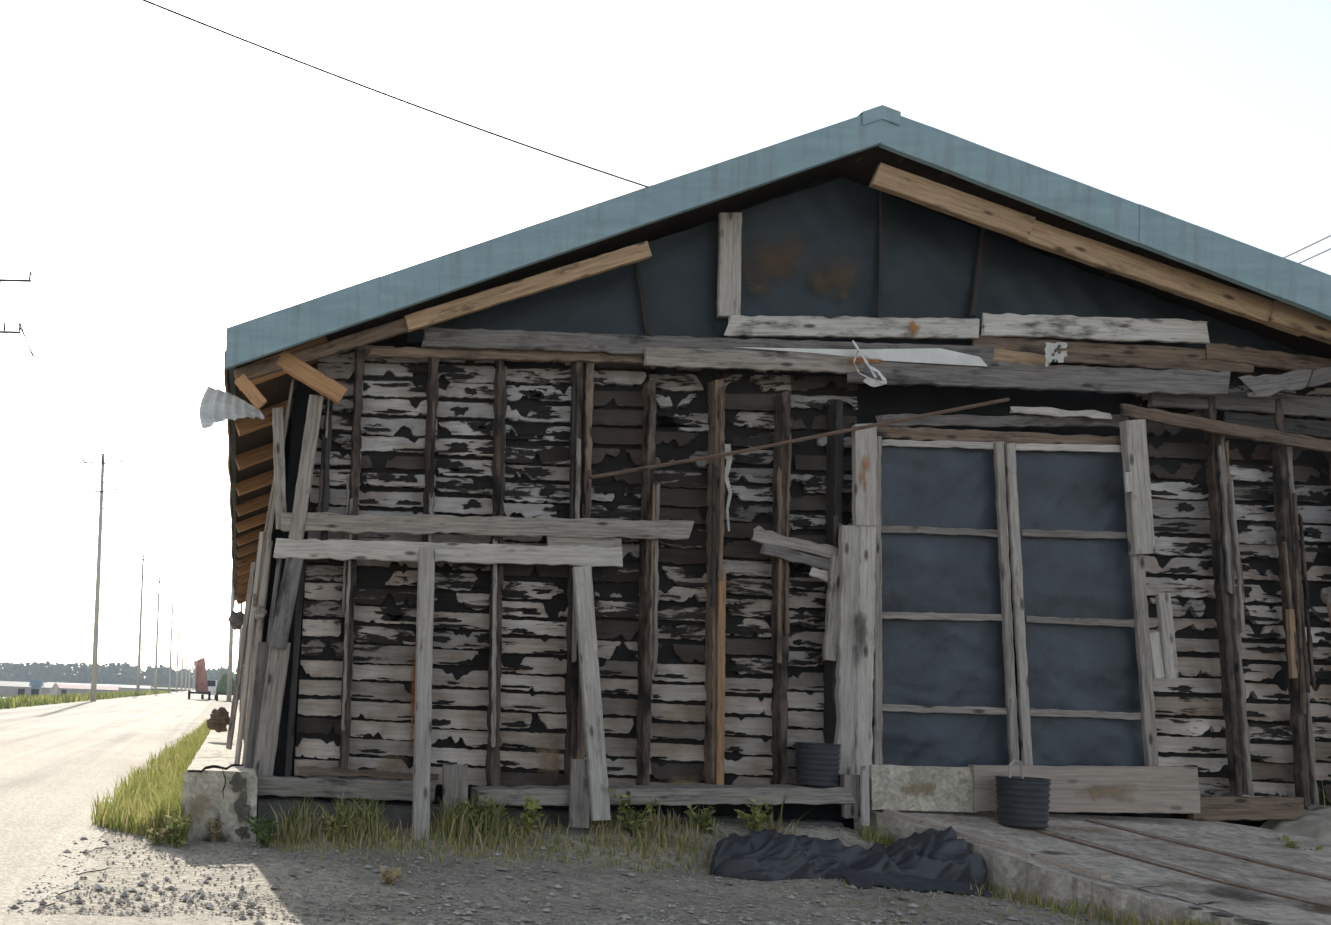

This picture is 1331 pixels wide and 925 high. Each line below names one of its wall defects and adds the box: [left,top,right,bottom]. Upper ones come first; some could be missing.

peeling [359,364,494,509]
peeling [507,389,570,440]
peeling [657,413,701,428]
peeling [505,465,570,517]
peeling [1151,485,1212,574]
peeling [1236,551,1281,598]
peeling [374,608,416,642]
peeling [433,617,490,665]
peeling [444,580,553,635]
peeling [1245,615,1285,653]
peeling [501,665,534,689]
peeling [432,700,455,726]